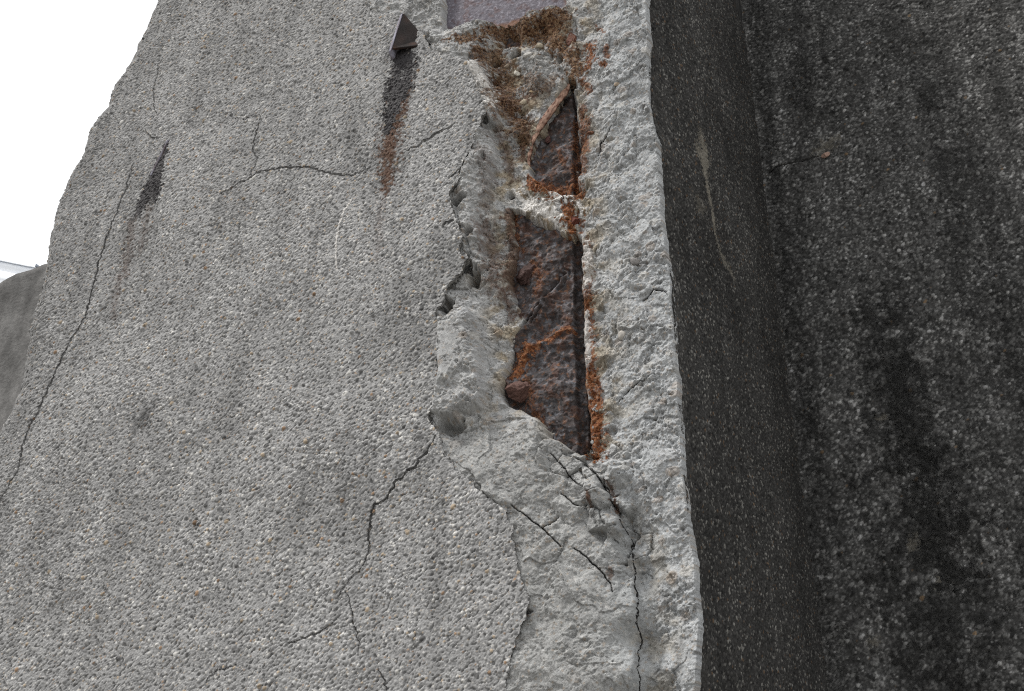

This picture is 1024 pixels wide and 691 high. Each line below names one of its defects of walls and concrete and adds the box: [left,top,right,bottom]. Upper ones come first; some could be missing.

crack [0,167,132,499]
crack [227,114,368,190]
corrosion [371,47,422,197]
corrosion [441,6,610,463]
spalling [358,0,704,691]
crack [291,437,435,691]
crack [515,456,643,691]